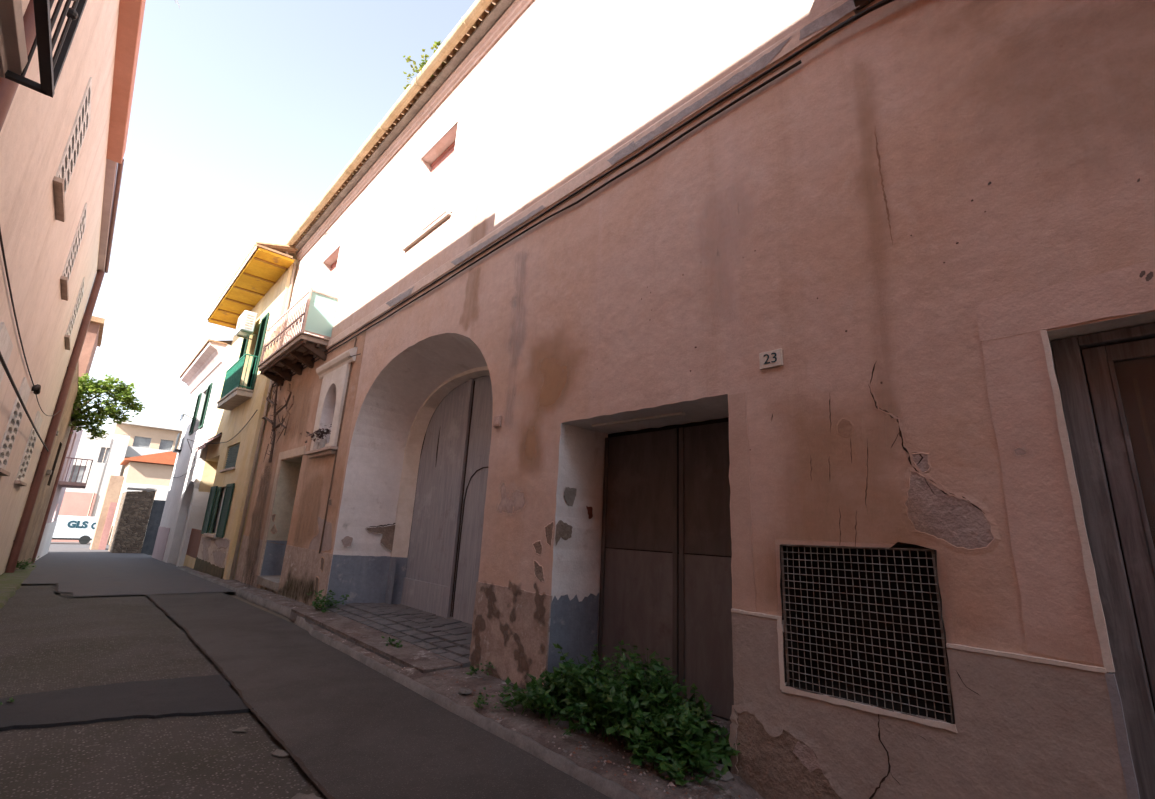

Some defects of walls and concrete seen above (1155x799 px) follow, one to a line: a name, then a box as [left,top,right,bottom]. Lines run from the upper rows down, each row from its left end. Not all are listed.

flaking render [308,498,353,606]
spalling [364,524,396,552]
peeling [532,520,573,625]
spalling [564,487,593,519]
crack [810,361,986,547]
spalling [899,452,1002,555]
peeling [471,581,544,689]
flaking render [729,703,855,799]
crack [869,714,899,799]